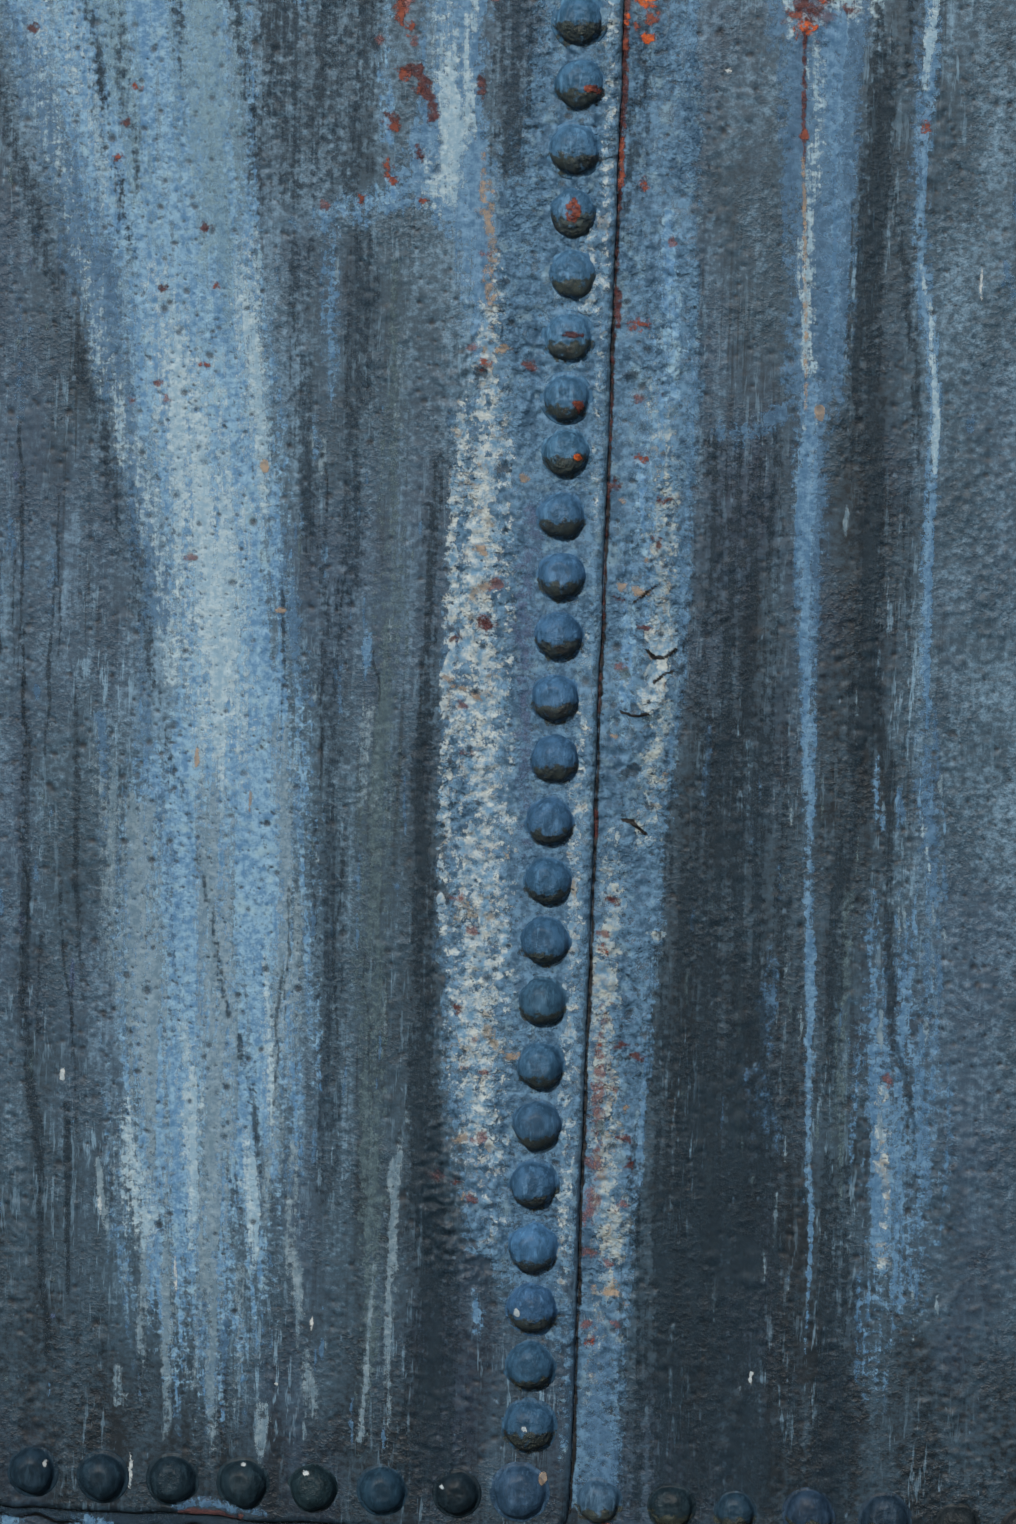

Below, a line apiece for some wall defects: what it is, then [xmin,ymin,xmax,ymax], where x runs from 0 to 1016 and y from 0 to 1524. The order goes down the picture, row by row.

rust [584,84,602,94]
rust [613,0,660,337]
rust [781,0,859,281]
rust [597,356,621,711]